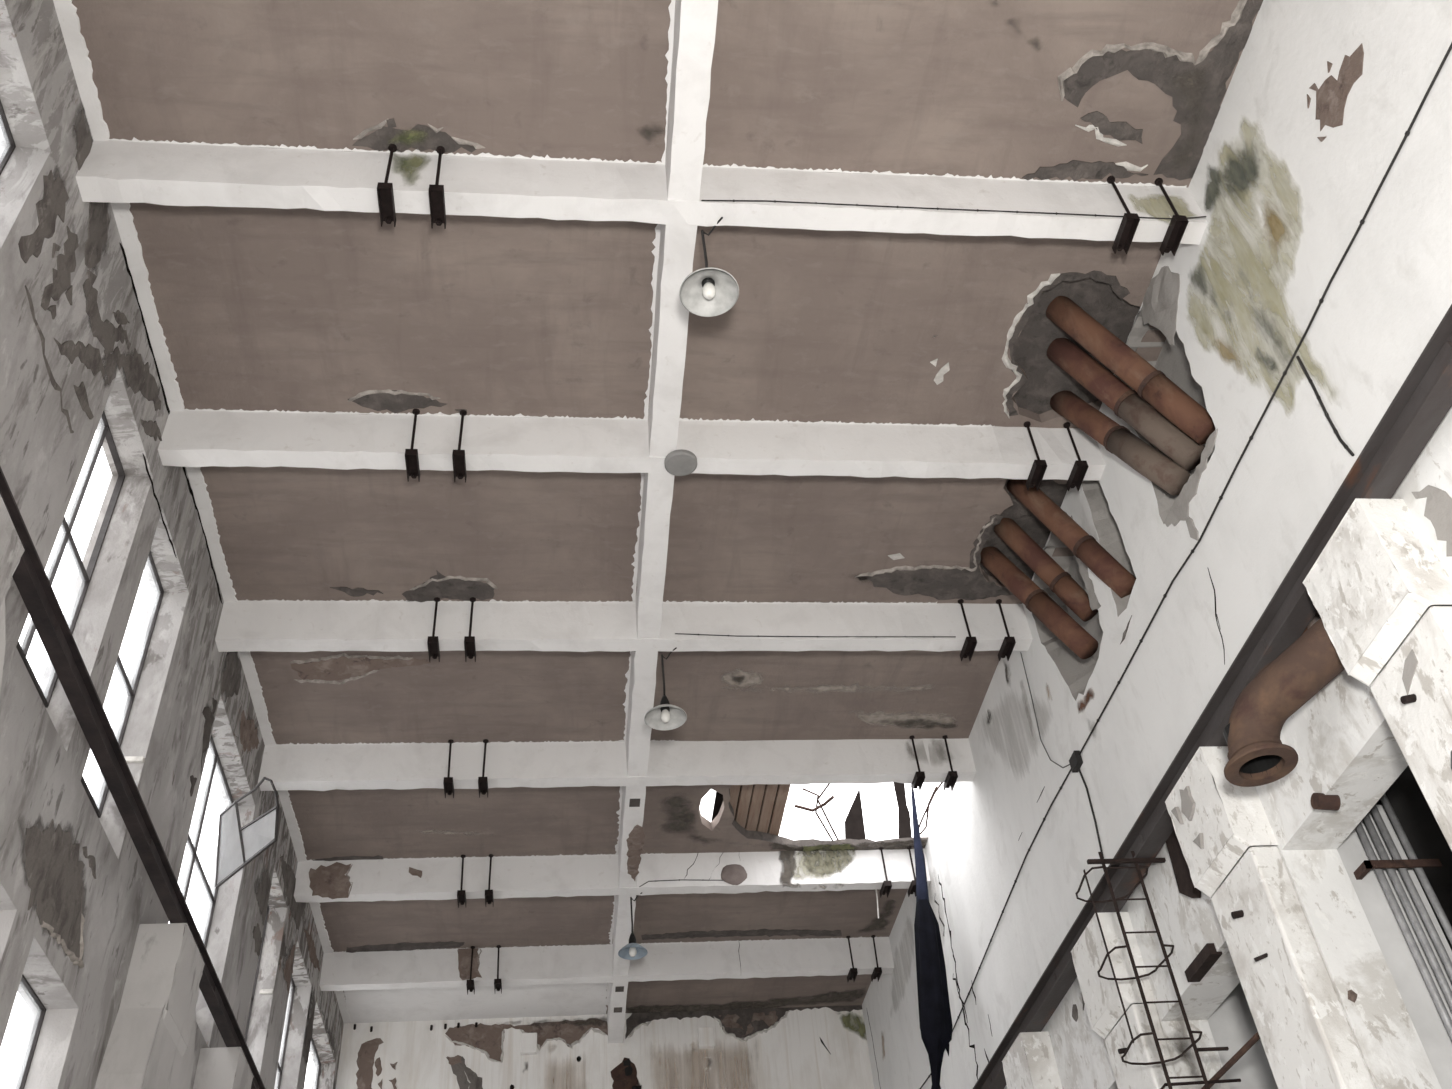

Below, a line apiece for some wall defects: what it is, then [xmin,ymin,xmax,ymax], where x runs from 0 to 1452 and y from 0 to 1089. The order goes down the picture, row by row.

spalling [352,118,485,181]
spalling [1022,0,1263,181]
peeling [1307,43,1364,142]
peeling [18,168,162,441]
spalling [1002,266,1180,418]
mould [1135,122,1324,407]
peeling [1412,485,1452,557]
peeling [19,816,96,968]
peeling [253,855,383,994]
water stain [779,844,855,889]
peeling [356,1038,397,1089]
spalling [445,1005,862,1089]